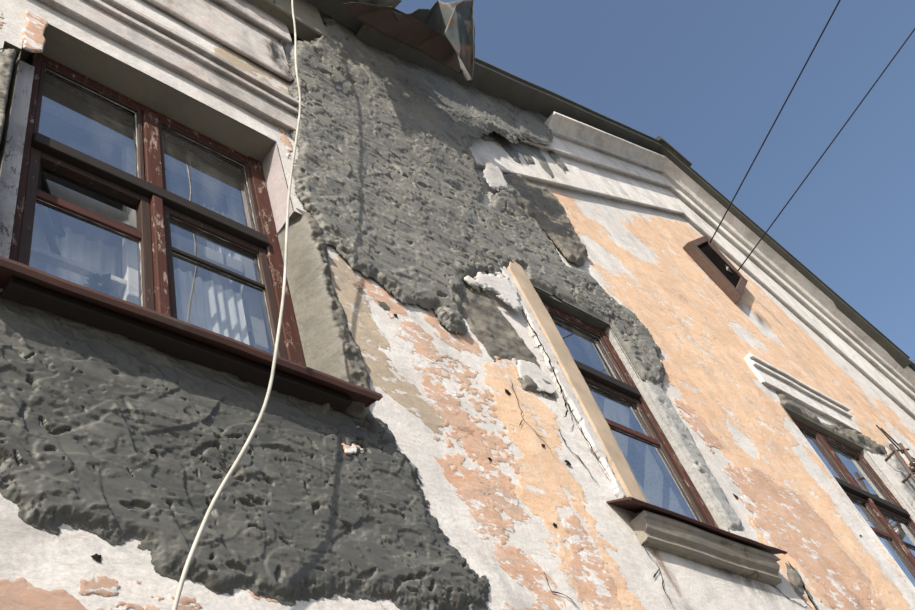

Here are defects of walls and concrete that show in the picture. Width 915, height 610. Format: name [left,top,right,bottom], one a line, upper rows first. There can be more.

flaking render [0,41,21,142]
peeling [277,208,645,610]
crack [510,310,616,488]
peeling [483,159,915,610]
peeling [0,576,202,610]
crack [643,545,673,606]